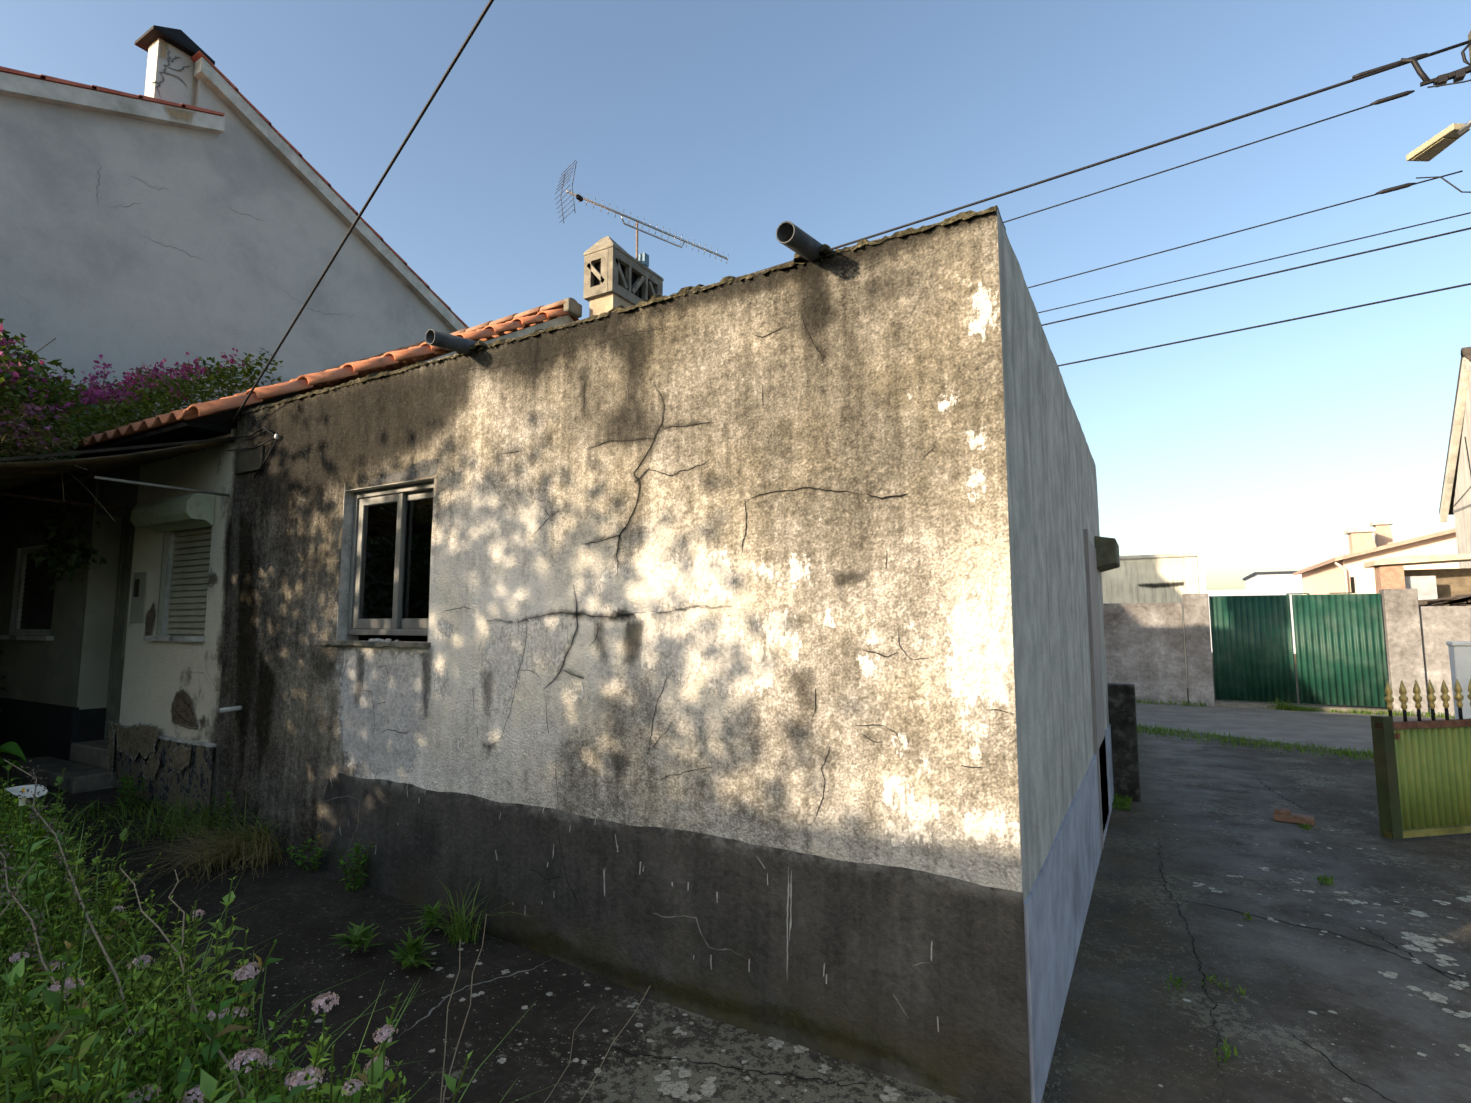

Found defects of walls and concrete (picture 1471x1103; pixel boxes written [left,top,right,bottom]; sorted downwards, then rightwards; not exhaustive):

crack [152,41,191,97]
peeling [968,282,1001,342]
peeling [938,377,957,414]
damp [236,211,981,771]
crack [537,327,908,575]
peeling [964,427,986,502]
peeling [856,627,892,685]
peeling [904,578,1015,766]
flaking render [108,686,205,788]
peeling [879,733,1020,853]
crack [1155,829,1471,1103]